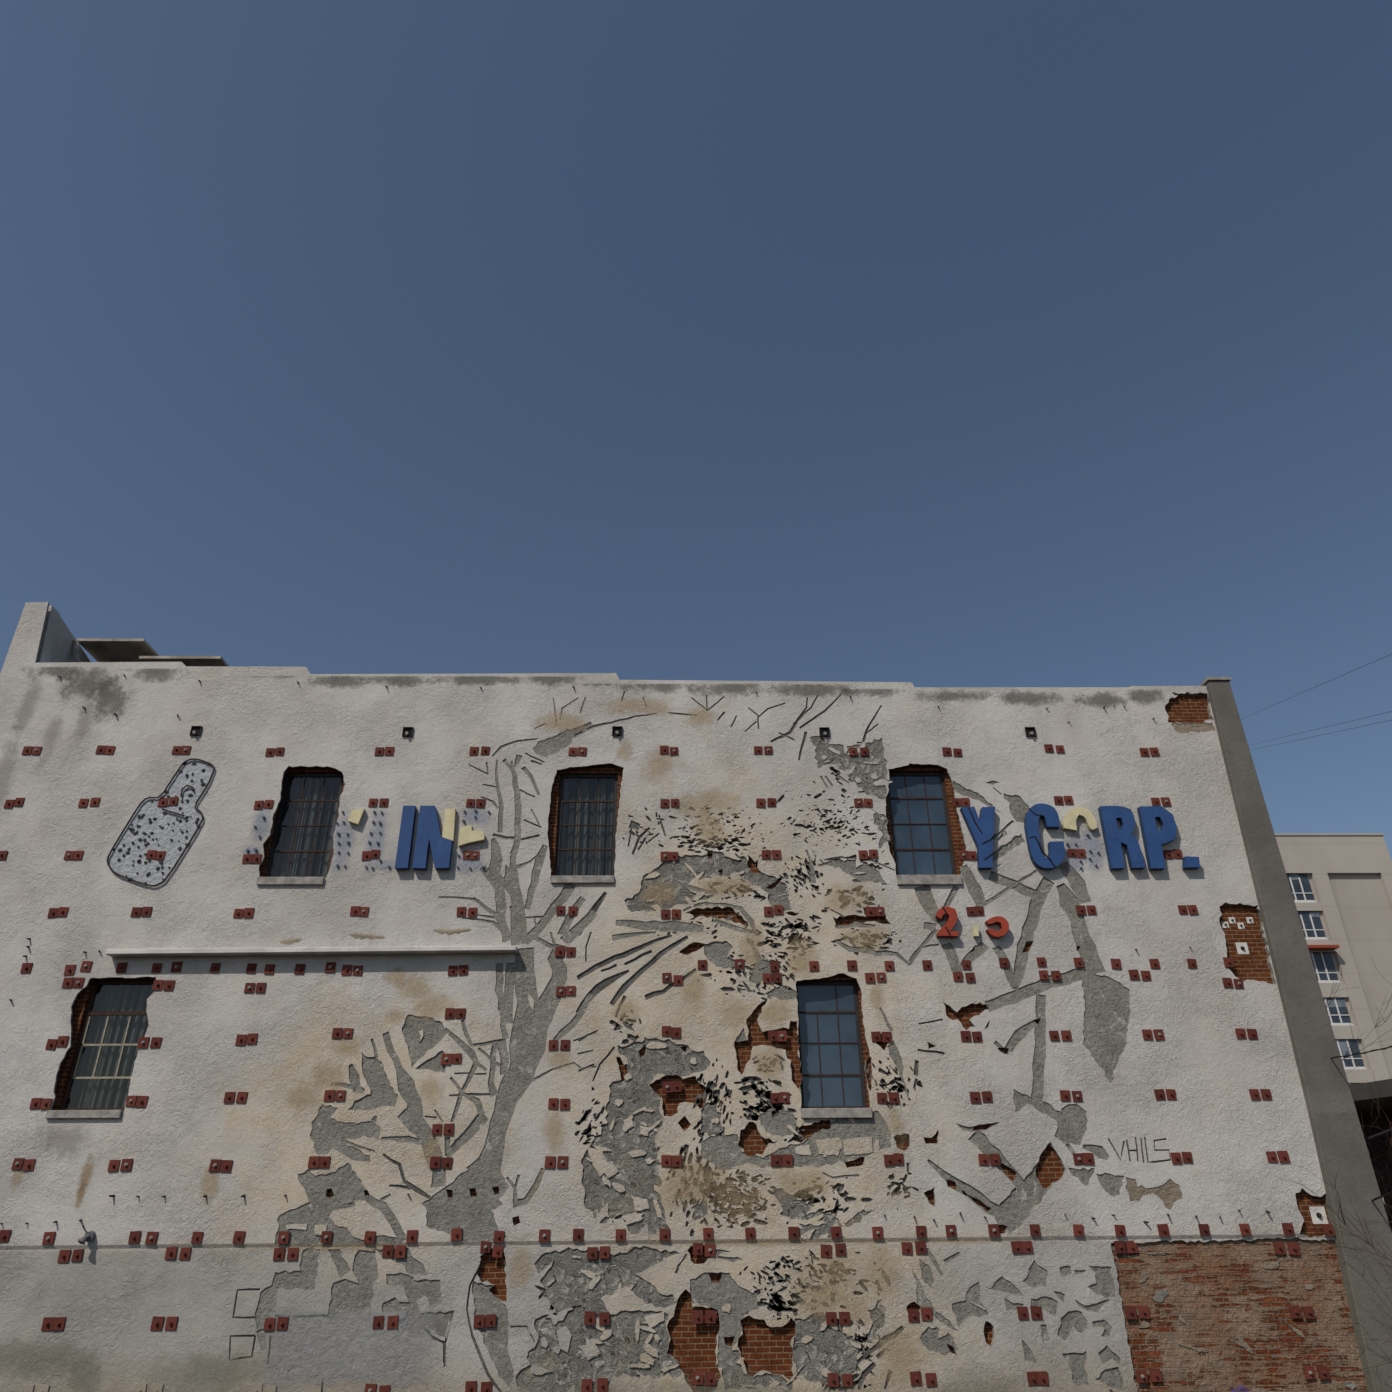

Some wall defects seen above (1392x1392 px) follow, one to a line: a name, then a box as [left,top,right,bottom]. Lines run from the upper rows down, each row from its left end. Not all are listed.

leakage [41,667,123,713]
leakage [138,668,169,680]
flaking render [1165,693,1215,733]
flaking render [1219,903,1275,984]
peeling [255,697,1183,1392]
flaking render [906,1189,1368,1392]